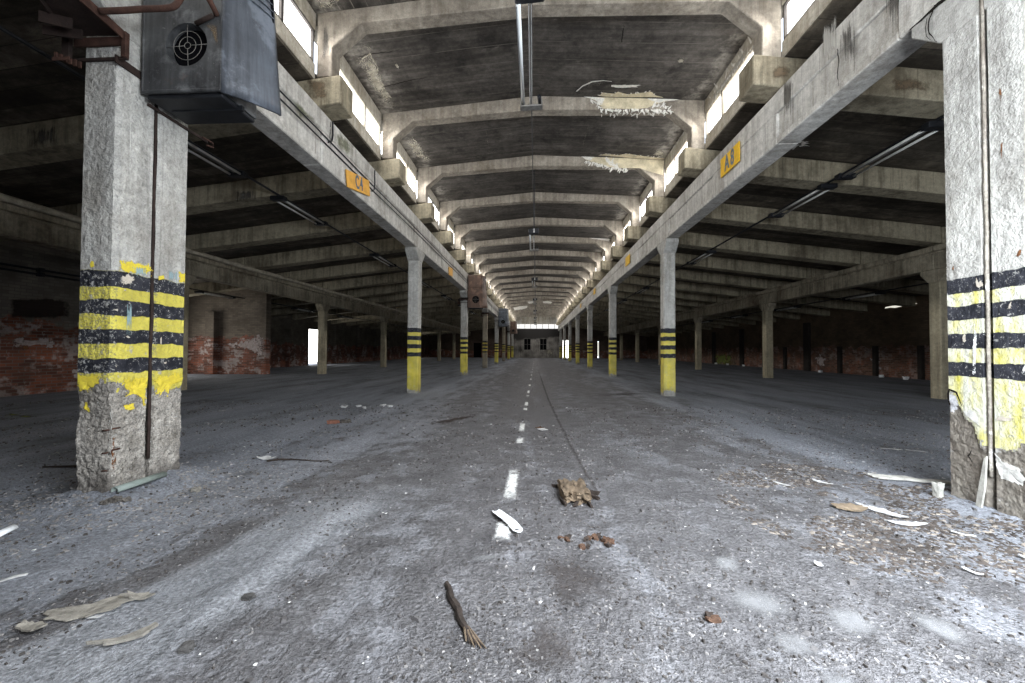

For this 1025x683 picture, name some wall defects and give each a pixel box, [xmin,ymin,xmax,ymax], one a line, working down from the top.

water stain [886,0,899,33]
crack [925,5,937,42]
water stain [819,22,855,79]
water stain [360,53,391,98]
peeling [577,80,678,118]
peeling [581,153,665,175]
peeling [13,337,64,348]
peeling [228,334,264,356]
spalling [72,362,183,494]
spalling [947,389,1025,520]